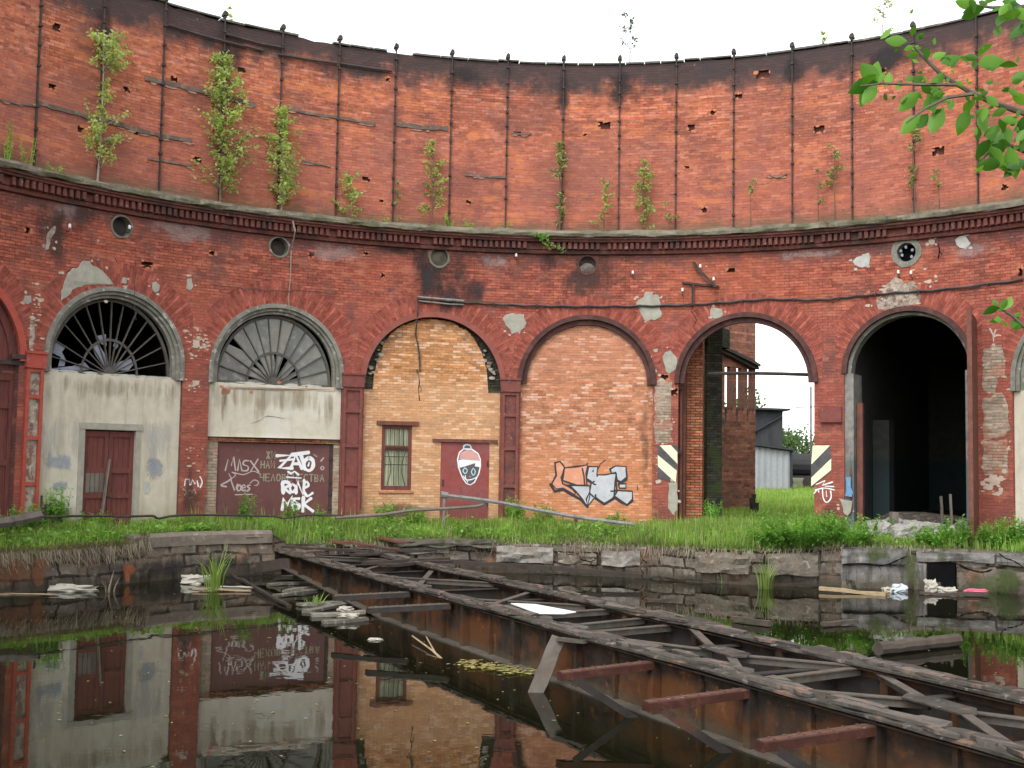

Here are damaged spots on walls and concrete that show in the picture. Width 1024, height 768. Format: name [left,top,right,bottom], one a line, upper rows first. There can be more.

flaking render [58,260,129,300]
peeling [183,327,211,360]
leakage [414,252,484,309]
flaking render [503,313,527,336]
flaking render [634,290,664,323]
spalling [865,268,938,309]
spalling [651,347,678,445]
spalling [980,343,1010,503]
flaking render [655,457,681,515]